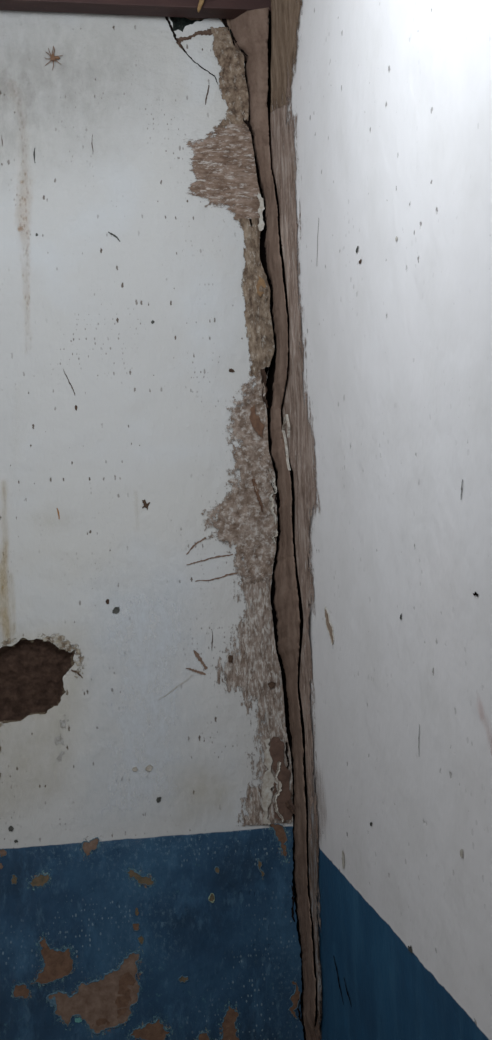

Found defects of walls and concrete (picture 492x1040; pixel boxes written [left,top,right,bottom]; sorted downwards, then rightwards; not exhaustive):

flaking render [170,17,295,865]
crack [165,13,318,1040]
flaking render [270,0,334,1040]
flaking render [0,633,84,762]
peeling [0,826,56,891]
peeling [77,836,103,859]
peeling [10,907,176,1040]
peeling [194,998,241,1040]